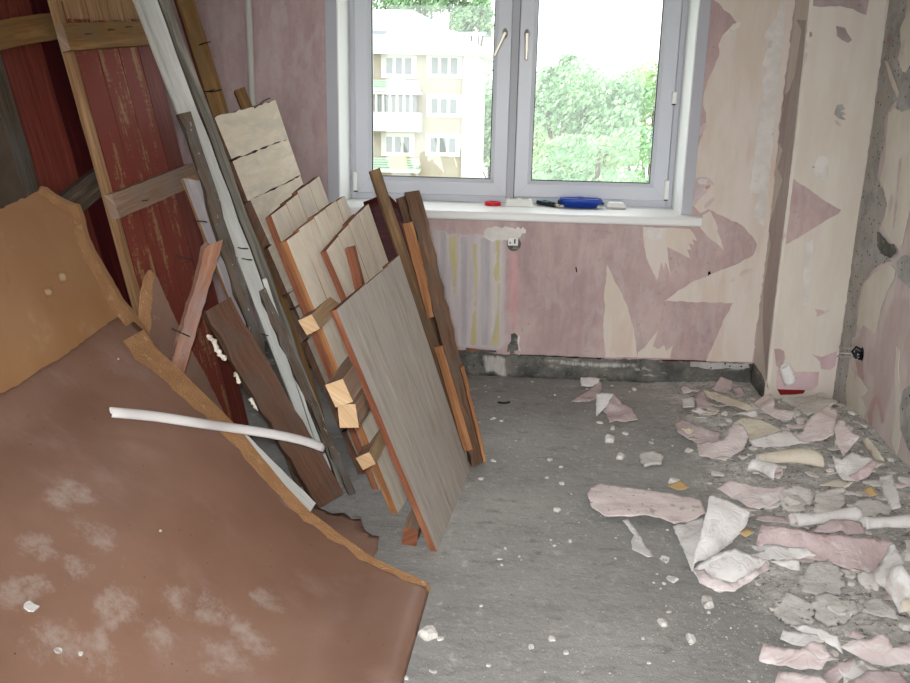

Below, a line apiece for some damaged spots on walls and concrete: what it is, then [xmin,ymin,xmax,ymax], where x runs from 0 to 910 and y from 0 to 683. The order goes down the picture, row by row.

spalling [690,361,750,370]
peeling [767,0,813,385]
spalling [832,0,910,406]